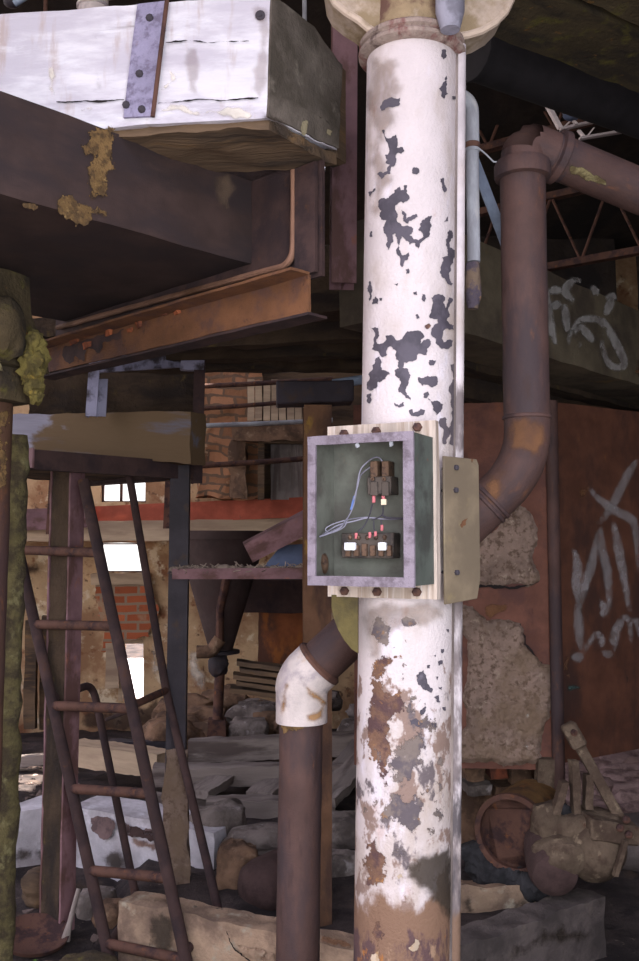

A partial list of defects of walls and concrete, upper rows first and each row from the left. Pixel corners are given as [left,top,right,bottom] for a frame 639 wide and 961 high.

peeling [380,97,400,111]
peeling [439,76,456,99]
peeling [368,130,432,274]
corrosion [62,329,123,364]
peeling [366,217,455,446]
spalling [479,505,540,587]
corrosion [281,688,326,734]
corrosion [363,655,405,788]
spalling [462,604,551,767]
corrosion [362,837,387,885]